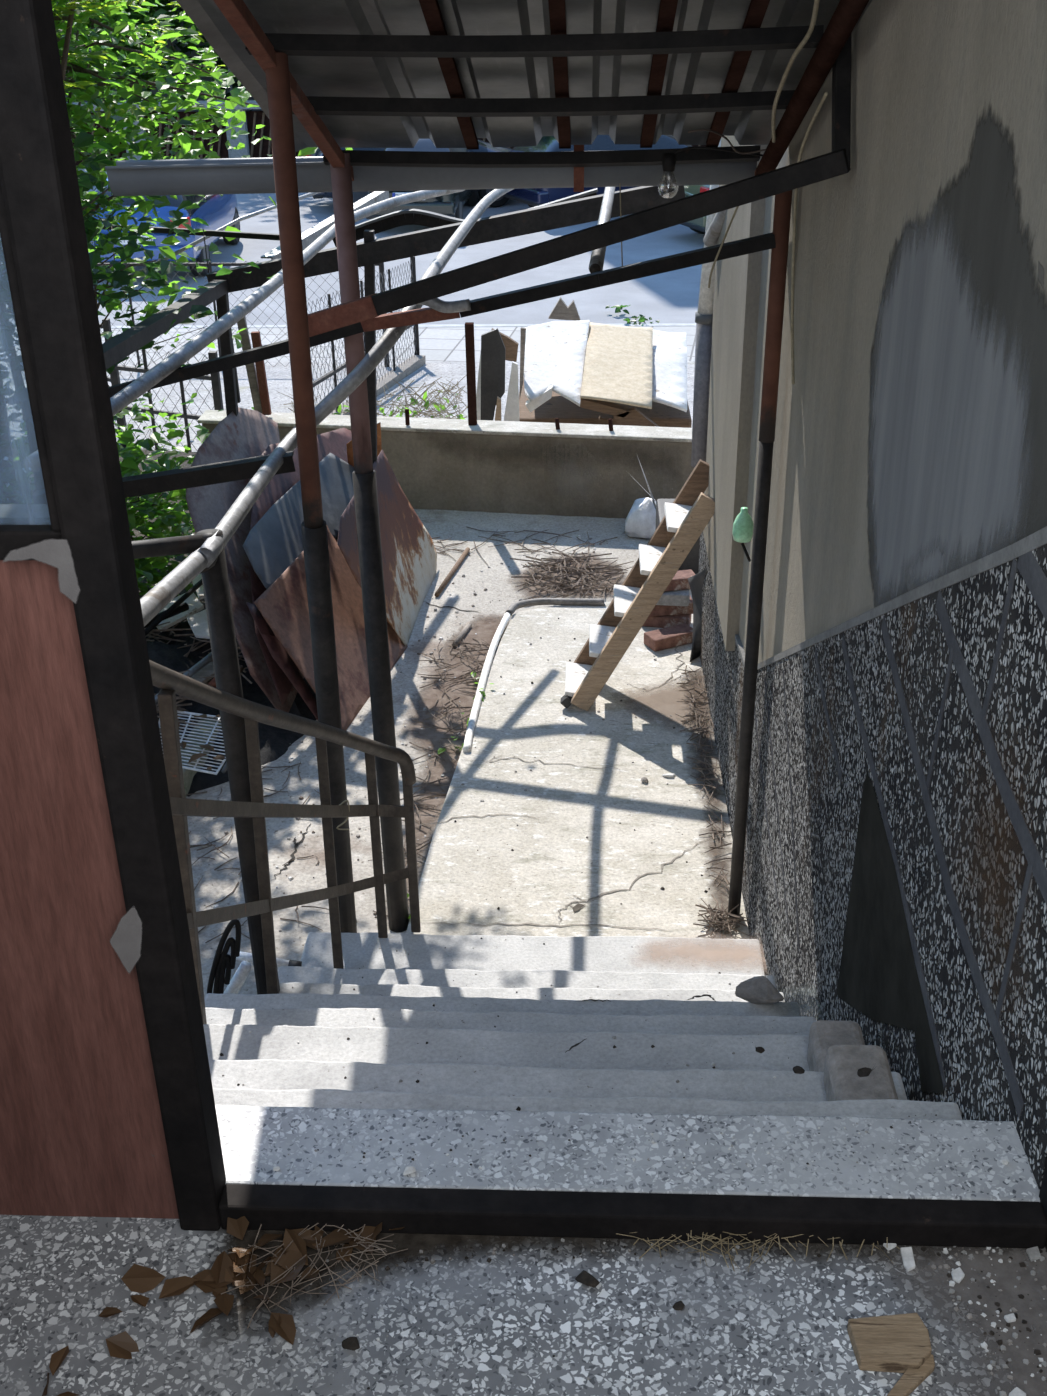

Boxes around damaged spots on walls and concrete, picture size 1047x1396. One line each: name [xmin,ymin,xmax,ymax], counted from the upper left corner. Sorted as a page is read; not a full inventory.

damp [867,107,1047,608]
crack [420,838,710,930]